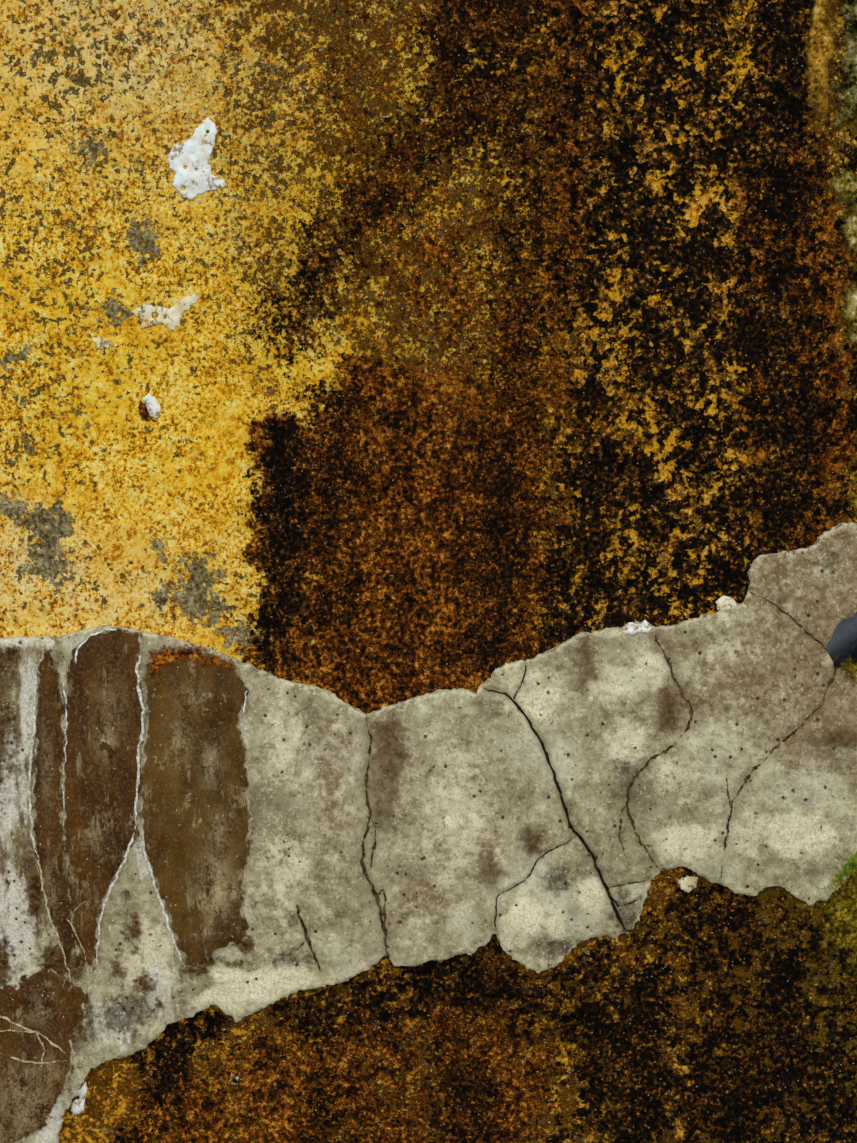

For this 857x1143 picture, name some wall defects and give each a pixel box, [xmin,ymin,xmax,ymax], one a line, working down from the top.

peeling [0,335,39,372]
peeling [121,212,163,269]
spalling [88,288,199,349]
spalling [167,117,225,200]
rust [313,0,606,712]
water stain [229,0,857,824]
rust [725,129,857,551]
rust [148,643,240,685]
crack [360,717,390,959]
crack [484,635,694,932]
crack [721,591,854,878]
crack [0,1016,66,1067]